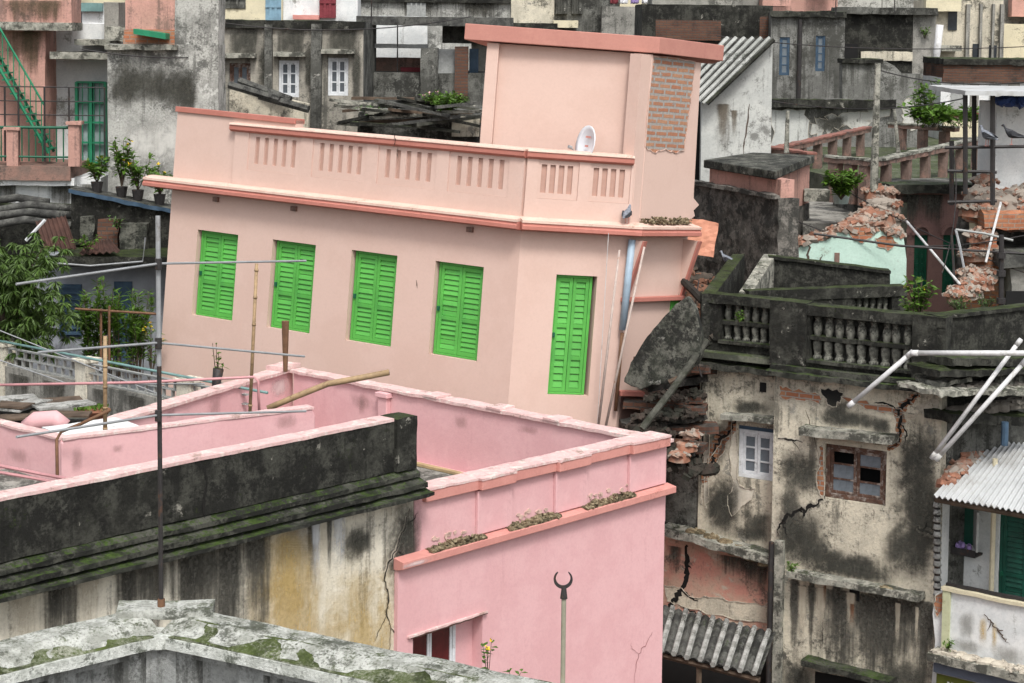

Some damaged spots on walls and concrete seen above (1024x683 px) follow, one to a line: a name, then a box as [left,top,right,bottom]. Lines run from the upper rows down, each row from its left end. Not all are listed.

flaking render [645,56,696,153]
flaking render [778,385,940,419]
crack [875,393,920,451]
flaking render [703,421,755,516]
flaking render [816,445,825,500]
leakage [45,585,77,629]
leakage [116,518,369,632]
crack [376,508,416,650]
crack [668,545,703,615]
leakage [708,482,767,540]
crack [775,496,842,537]
leakage [778,402,935,683]